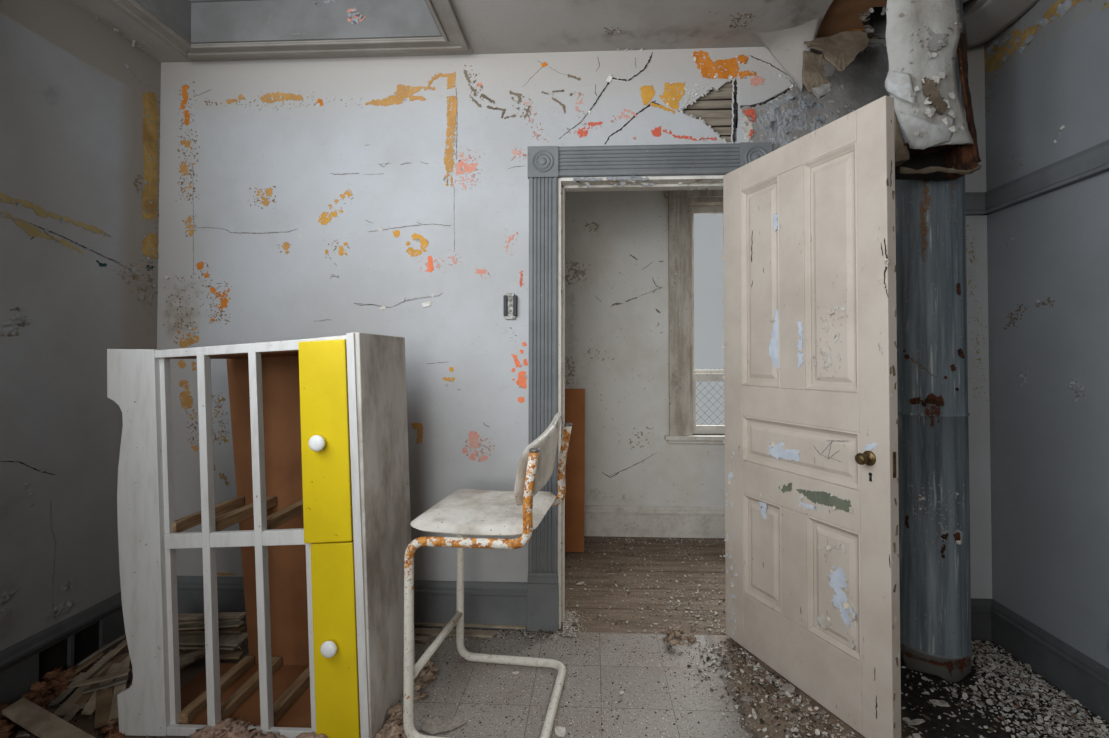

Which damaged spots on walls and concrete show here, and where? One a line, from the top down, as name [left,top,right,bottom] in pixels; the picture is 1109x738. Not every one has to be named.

peeling [176,50,764,237]
crack [559,48,654,140]
crack [604,100,660,144]
crack [731,55,793,143]
flaking render [740,0,888,151]
peeling [911,72,964,132]
peeling [984,0,1090,116]
peeling [96,92,232,452]
crack [192,170,298,277]
crack [354,293,443,308]
peeling [393,230,461,272]
corrosion [909,393,945,426]